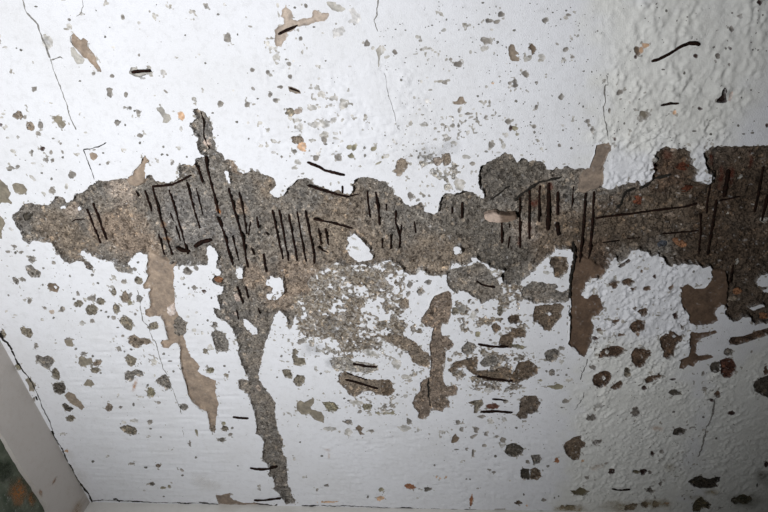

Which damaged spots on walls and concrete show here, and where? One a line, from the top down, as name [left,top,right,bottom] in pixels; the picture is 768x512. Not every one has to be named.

crack [22,0,76,129]
flaking render [442,96,488,142]
spalling [0,107,768,505]
spalling [624,481,662,511]
spalling [688,476,720,512]